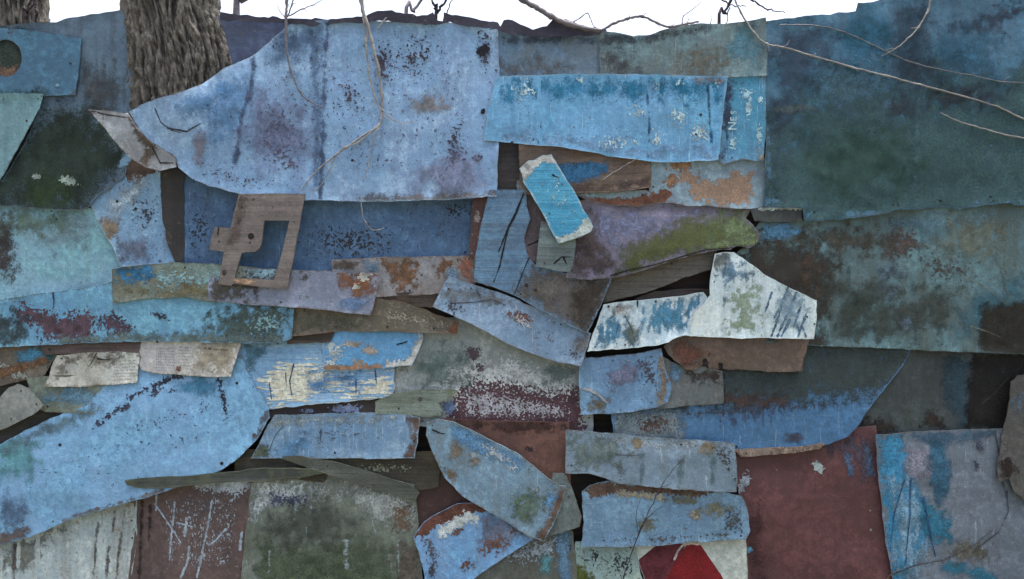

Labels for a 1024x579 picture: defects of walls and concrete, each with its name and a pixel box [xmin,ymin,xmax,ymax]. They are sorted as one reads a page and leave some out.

peeling [520,155,802,243]
corrosion [296,214,511,333]
peeling [248,309,448,413]
corrosion [457,207,984,474]
peeling [414,503,488,541]